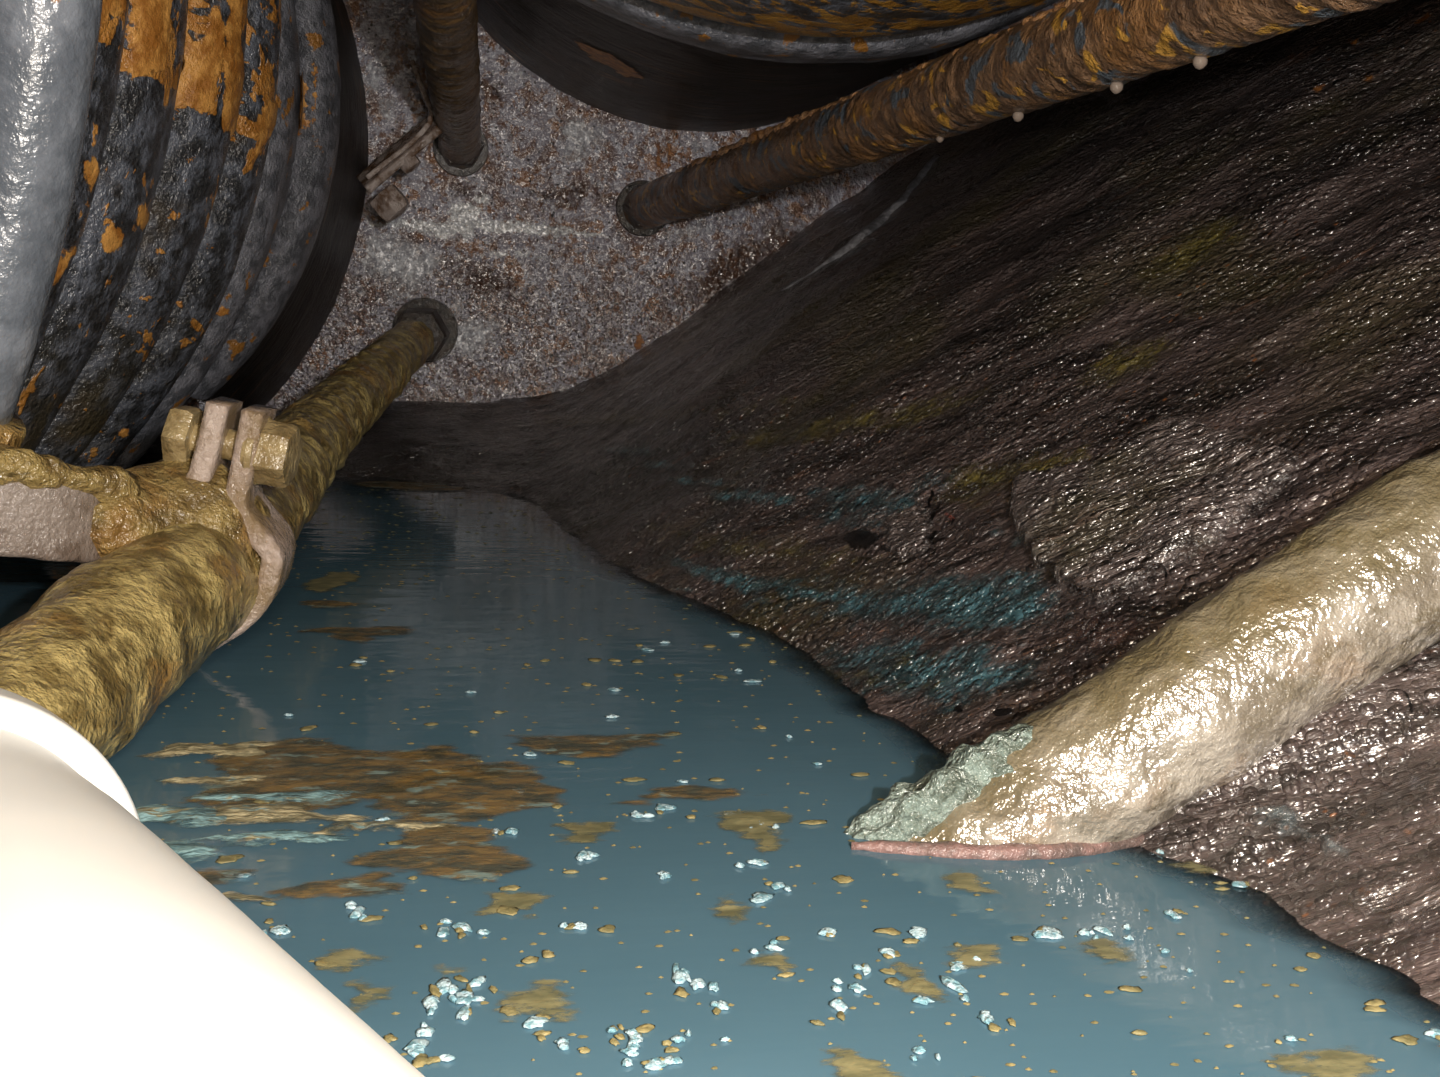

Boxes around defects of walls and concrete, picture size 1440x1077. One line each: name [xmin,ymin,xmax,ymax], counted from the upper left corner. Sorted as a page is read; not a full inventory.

corrosion [978,0,1085,44]
corrosion [656,90,864,181]
corrosion [680,220,798,300]